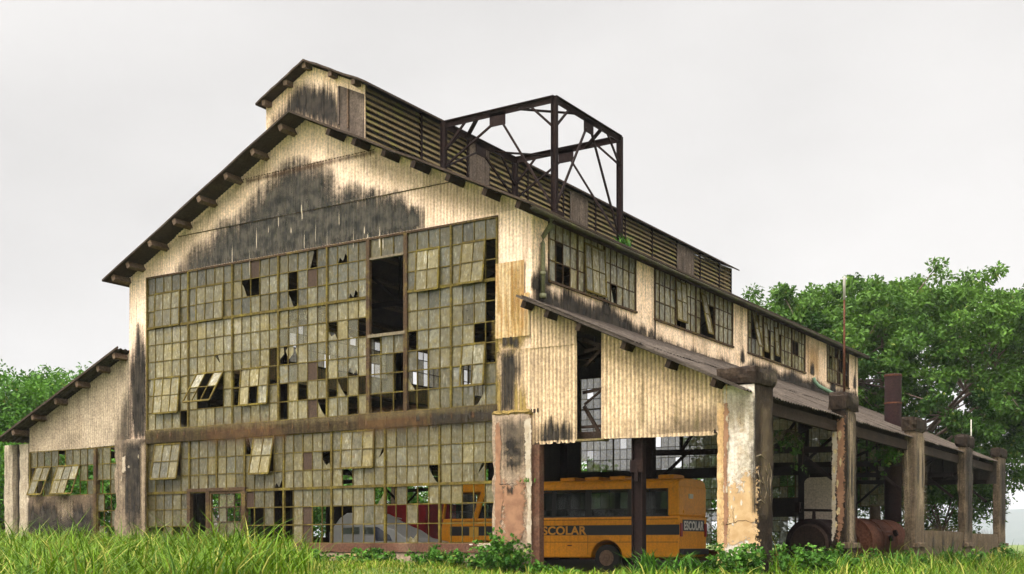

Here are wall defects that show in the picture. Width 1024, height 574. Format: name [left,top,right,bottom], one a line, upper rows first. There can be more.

leakage [272,83,340,129]
leakage [178,158,425,273]
leakage [117,324,149,530]
leakage [432,337,526,469]
flaking render [720,403,761,548]
flaking render [831,415,846,543]